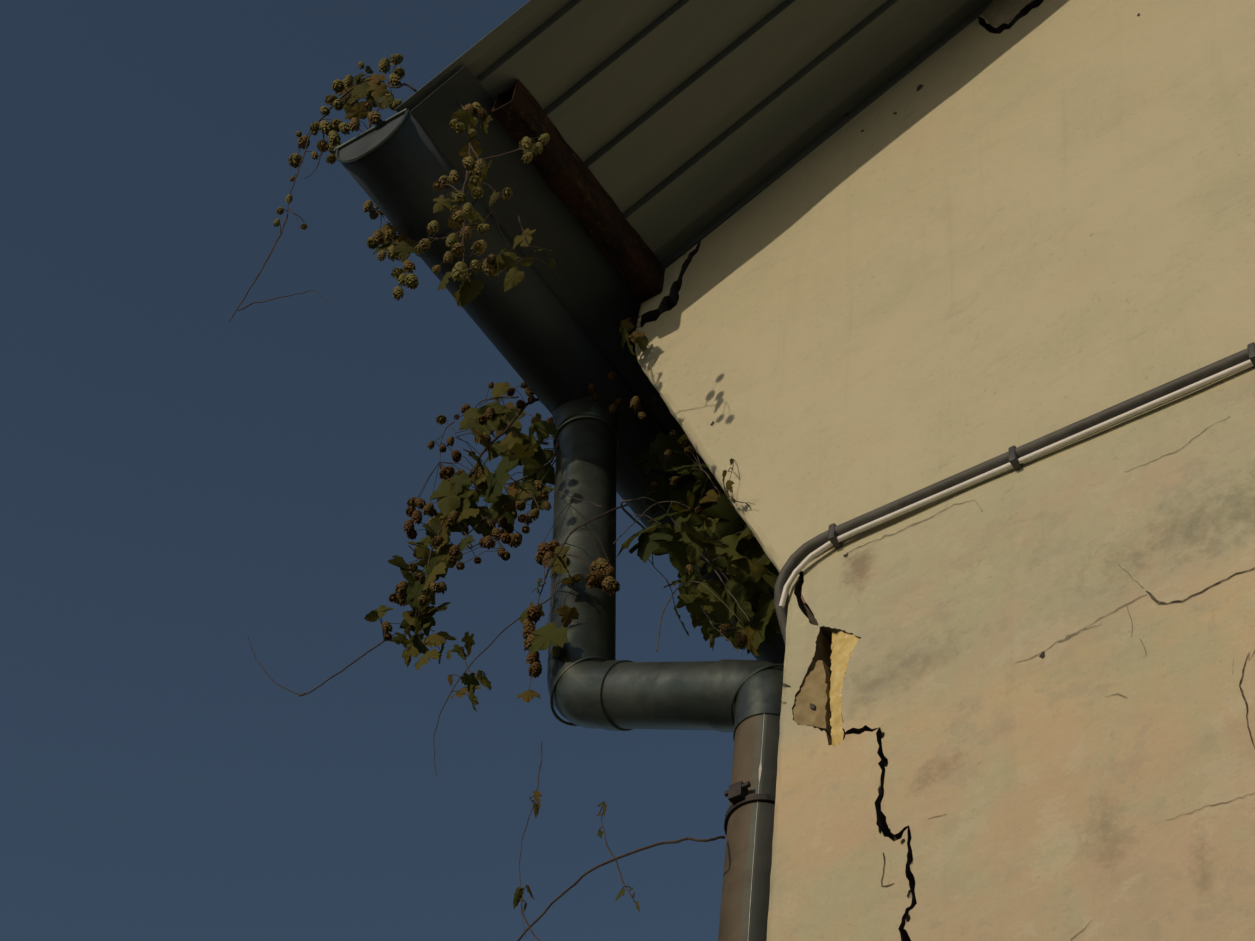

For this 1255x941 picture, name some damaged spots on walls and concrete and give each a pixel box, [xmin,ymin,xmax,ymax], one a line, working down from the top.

crack [978,0,1044,34]
crack [630,240,701,332]
crack [794,571,818,626]
crack [1146,567,1255,605]
flaking render [792,626,861,747]
crack [1239,650,1255,749]
crack [847,725,917,941]